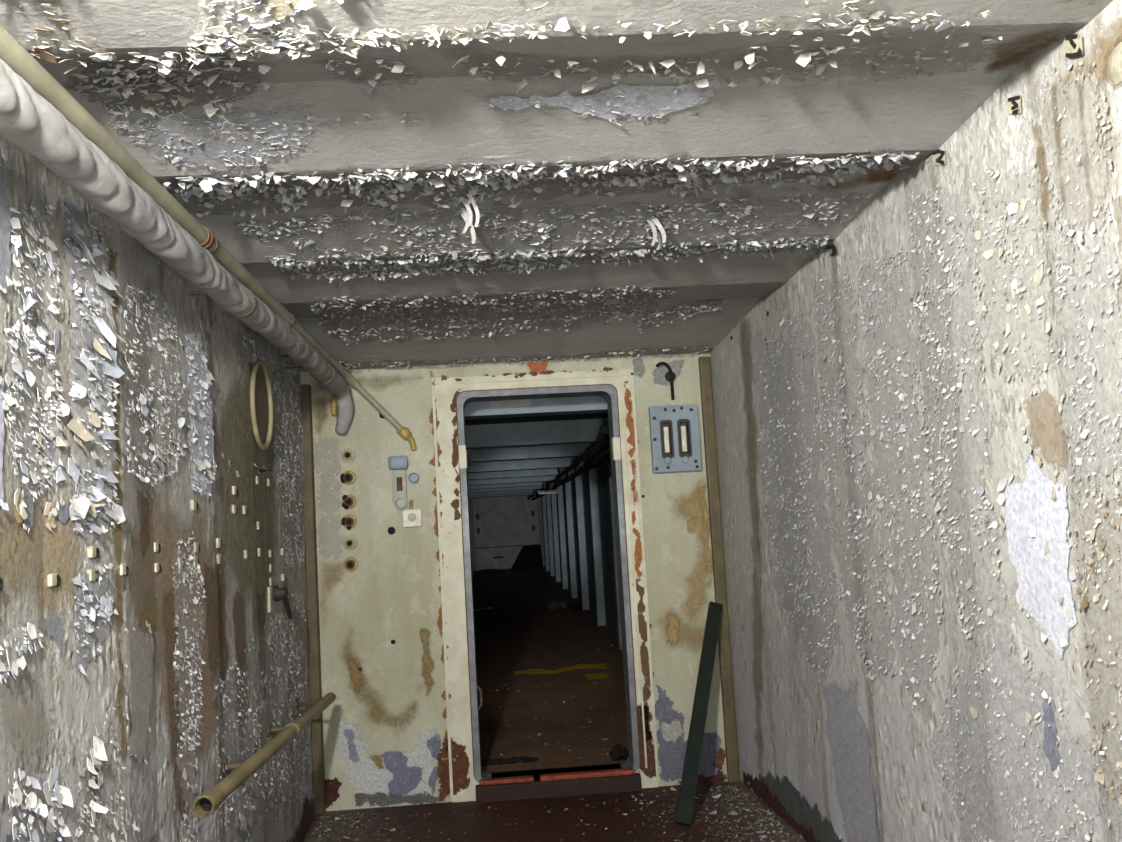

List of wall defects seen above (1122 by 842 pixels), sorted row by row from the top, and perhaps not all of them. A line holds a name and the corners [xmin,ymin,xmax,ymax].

peeling [20,0,1003,345]
damp [989,33,1053,71]
peeling [0,559,157,842]
peeling [0,149,217,541]
peeling [170,531,312,842]
damp [217,374,276,619]
peeling [238,333,340,576]
peeling [336,717,444,808]
peeling [339,346,710,386]
rust [429,360,660,800]
peeling [655,685,688,782]
peeling [748,62,1122,842]